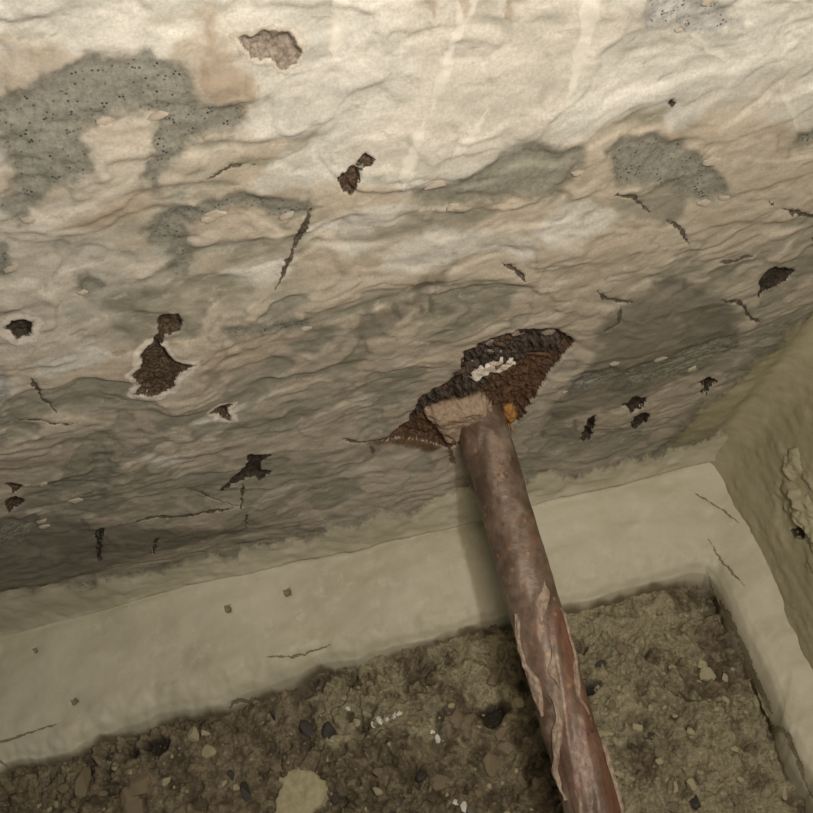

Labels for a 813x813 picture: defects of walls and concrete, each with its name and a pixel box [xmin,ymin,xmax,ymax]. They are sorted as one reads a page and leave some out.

spalling [230,25,307,75]
peeling [797,132,813,146]
spalling [337,153,375,195]
crack [275,208,312,290]
spalling [758,267,796,297]
spalling [0,312,45,346]
spalling [124,314,202,401]
spalling [381,328,574,449]
spalling [220,454,271,491]